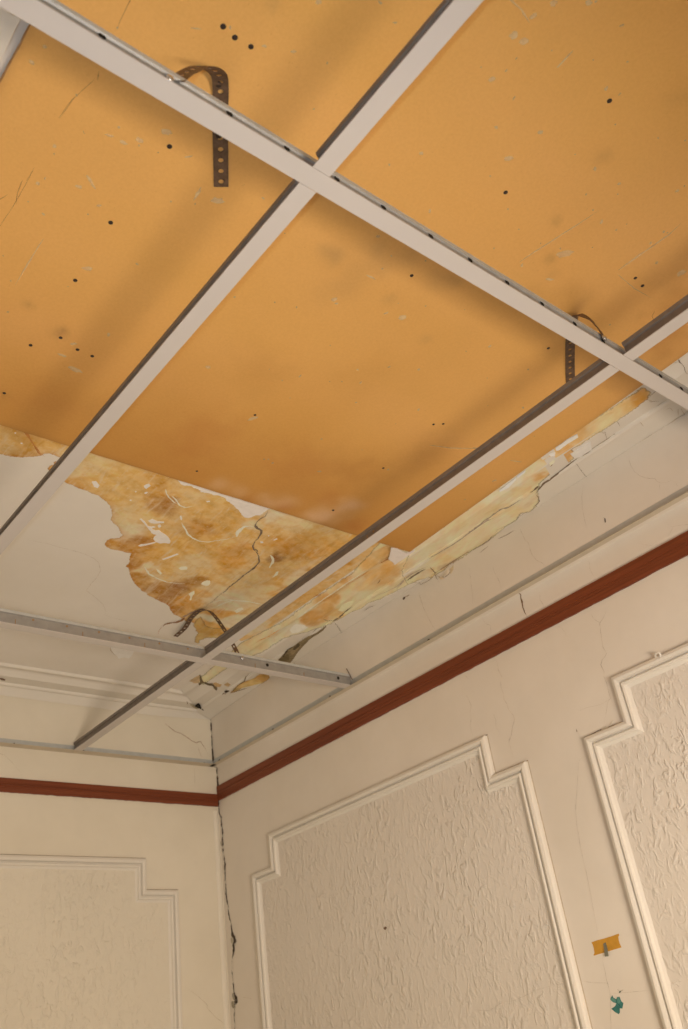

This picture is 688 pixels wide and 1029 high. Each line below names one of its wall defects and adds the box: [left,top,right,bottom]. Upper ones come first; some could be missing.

peeling [0,425,69,470]
peeling [64,453,356,630]
peeling [239,542,379,641]
peeling [388,548,415,565]
leakage [232,388,650,656]
spalling [278,626,326,663]
crack [167,719,238,1024]